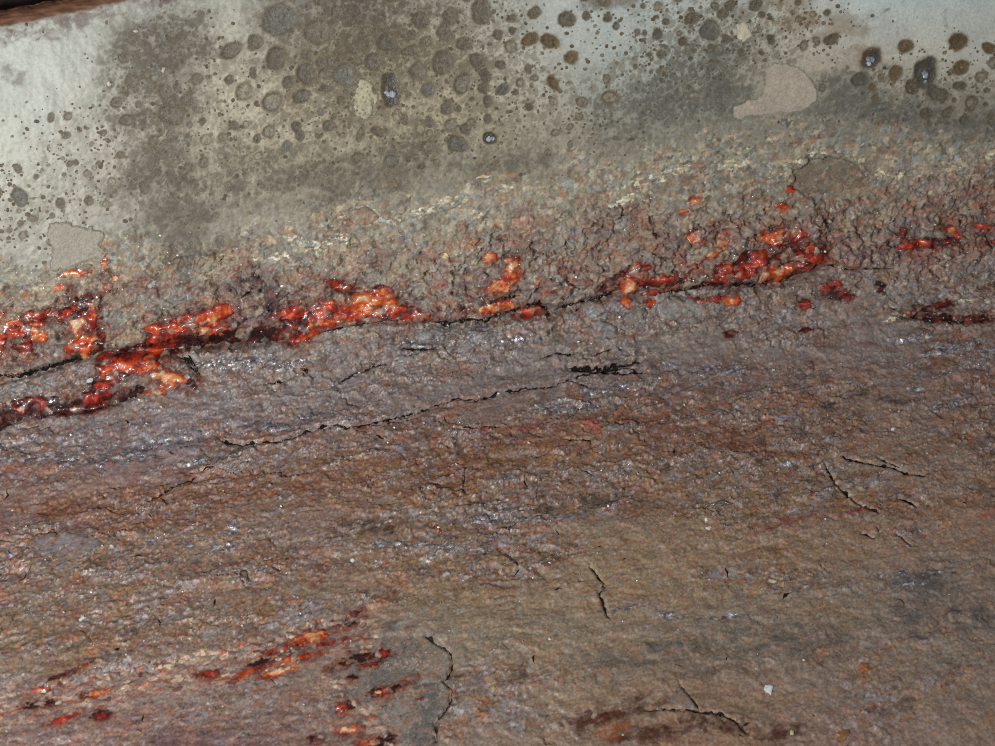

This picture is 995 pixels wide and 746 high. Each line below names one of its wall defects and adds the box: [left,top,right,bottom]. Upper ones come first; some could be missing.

damp [112,14,211,94]
spalling [631,1,669,75]
spalling [674,0,775,63]
peeling [733,63,825,120]
damp [125,105,213,244]
corrosion [453,251,543,320]
corrosion [686,185,832,306]
corrosion [0,254,444,423]
crack [218,364,637,446]
crack [149,466,214,502]
corrosion [192,608,393,685]
crack [428,636,453,738]